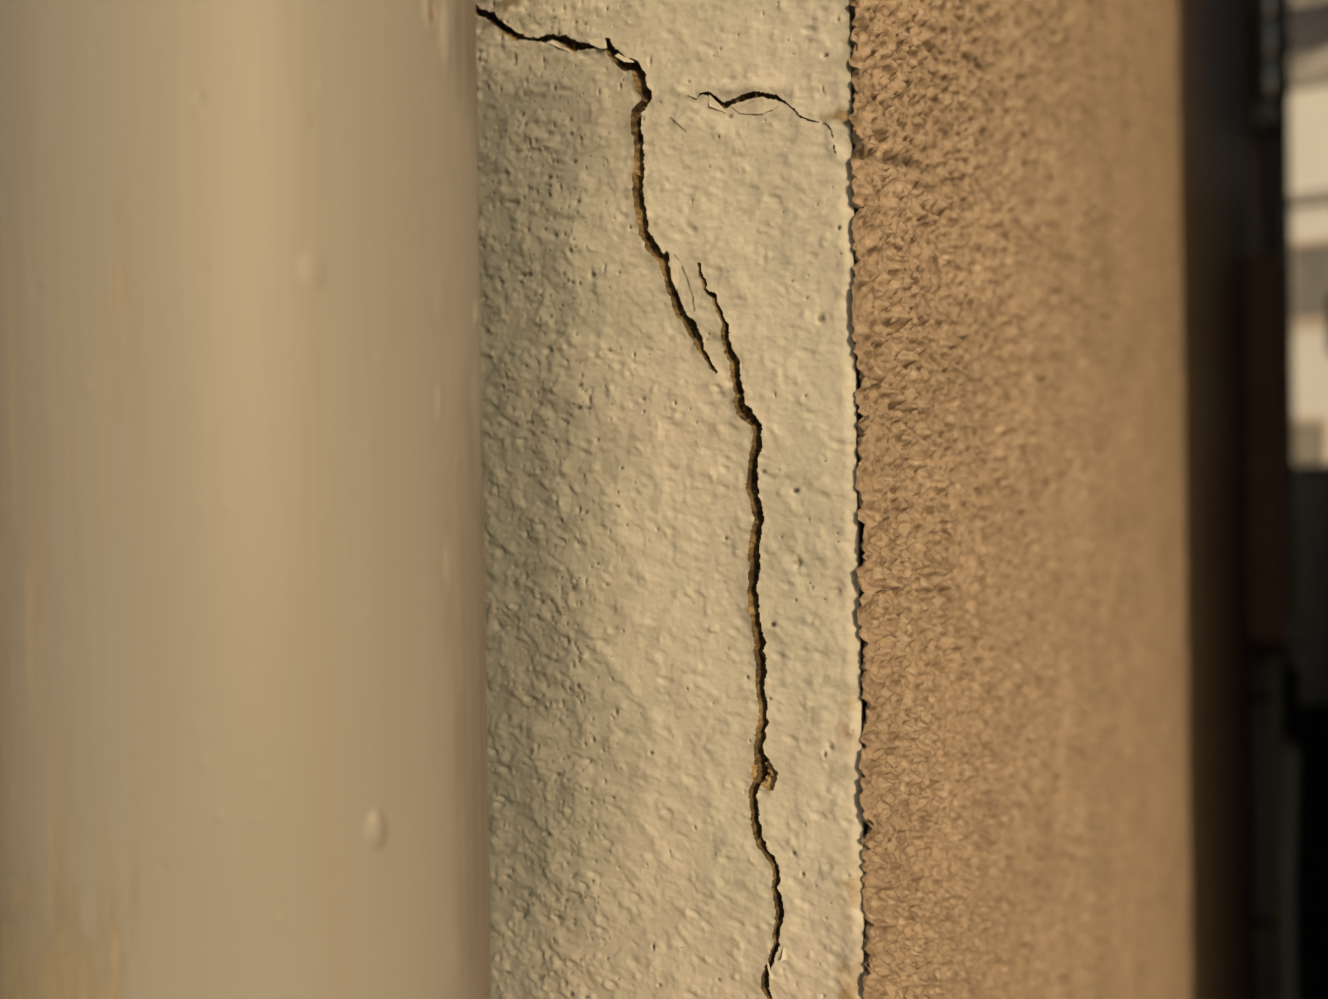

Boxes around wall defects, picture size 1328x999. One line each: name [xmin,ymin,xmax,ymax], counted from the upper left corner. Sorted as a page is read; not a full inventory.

crack [476,4,836,999]